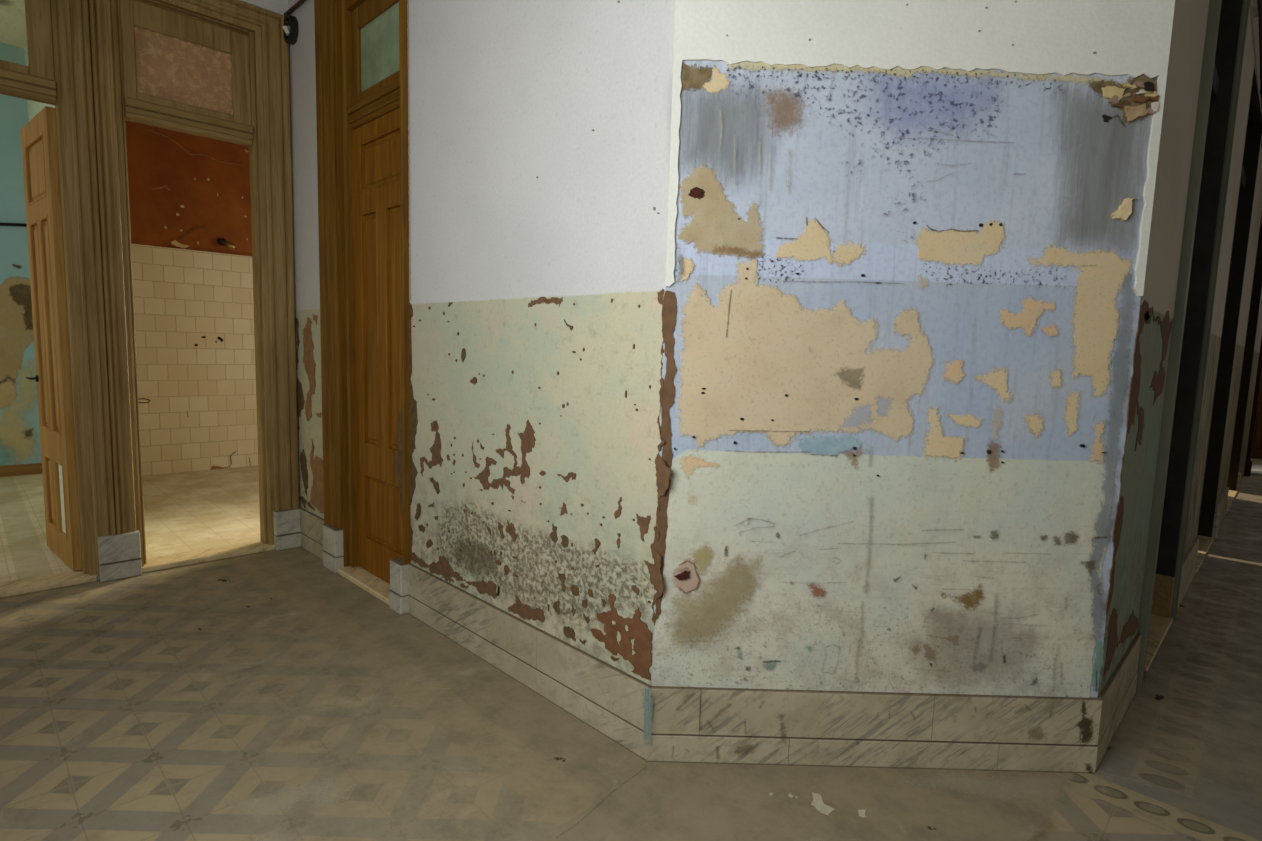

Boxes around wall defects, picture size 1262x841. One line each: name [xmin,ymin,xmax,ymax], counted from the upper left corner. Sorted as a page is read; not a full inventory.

damp [685,63,1142,240]
flaking render [681,61,1159,127]
peeling [1110,198,1138,221]
flaking render [0,264,36,462]
peeling [295,314,324,514]
peeling [395,302,576,599]
damp [438,509,647,620]
damp [694,545,713,571]
damp [660,559,811,683]
peeling [508,163,1013,680]
peeling [1000,245,1133,464]
peeling [1080,300,1172,677]